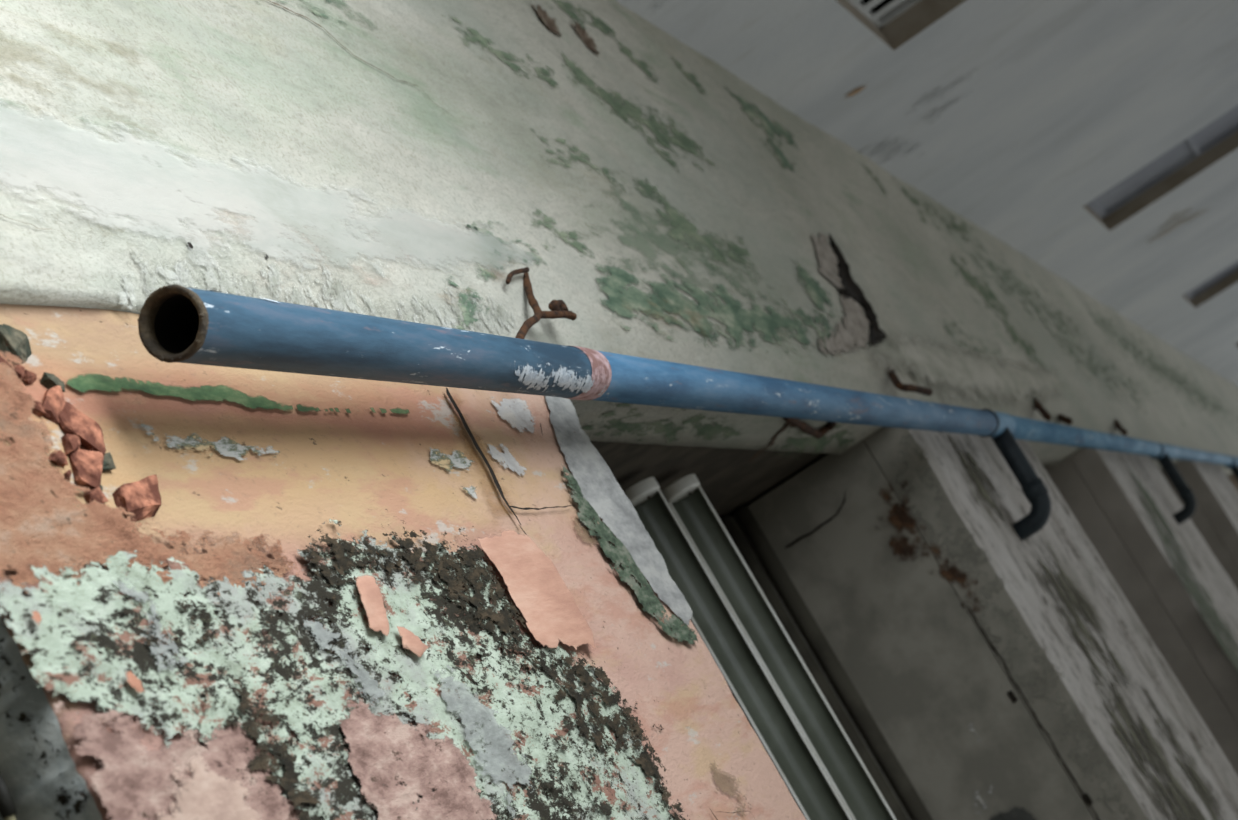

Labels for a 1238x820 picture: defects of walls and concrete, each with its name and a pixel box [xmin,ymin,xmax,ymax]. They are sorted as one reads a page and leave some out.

spalling [532,4,600,55]
spalling [812,232,870,357]
crack [446,388,573,536]
peeling [0,324,676,820]
peeling [561,462,698,644]
corrosion [880,481,979,611]
leakage [948,435,1238,820]